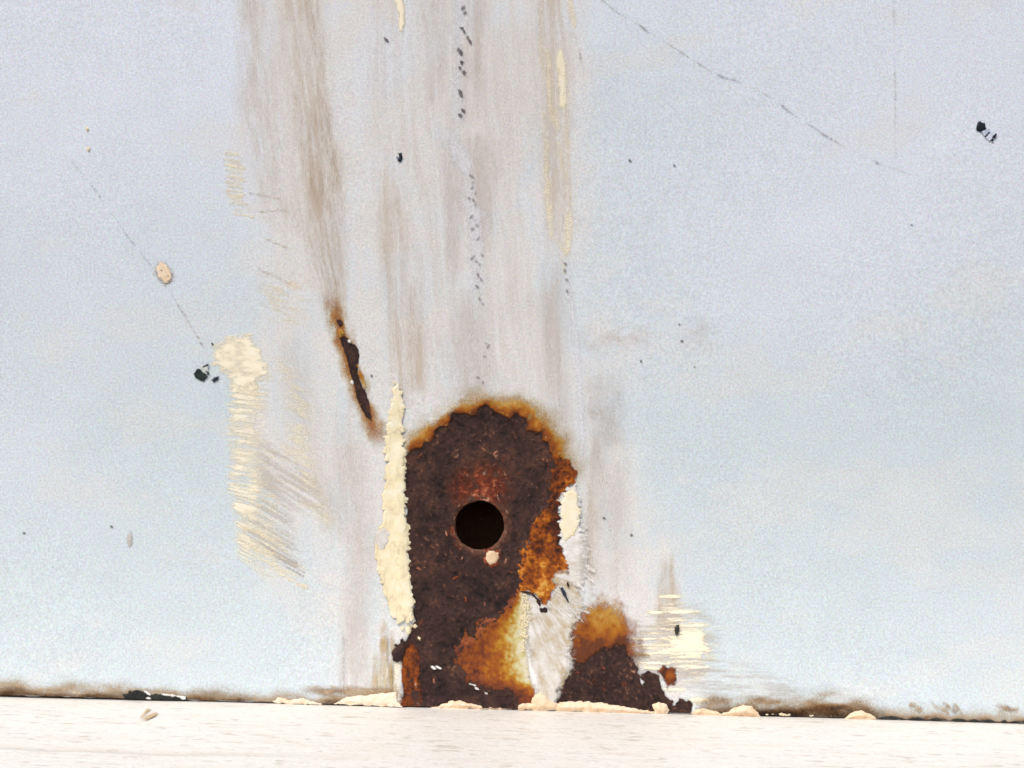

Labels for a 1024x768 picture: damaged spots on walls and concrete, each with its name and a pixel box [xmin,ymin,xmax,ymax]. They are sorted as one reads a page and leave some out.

leakage [0,680,401,705]
peeling [194,333,328,588]
corrosion [329,304,382,437]
peeling [372,381,421,698]
corrosion [391,393,578,709]
peeling [518,484,595,710]
corrosion [556,601,693,713]
leakage [702,694,1024,722]